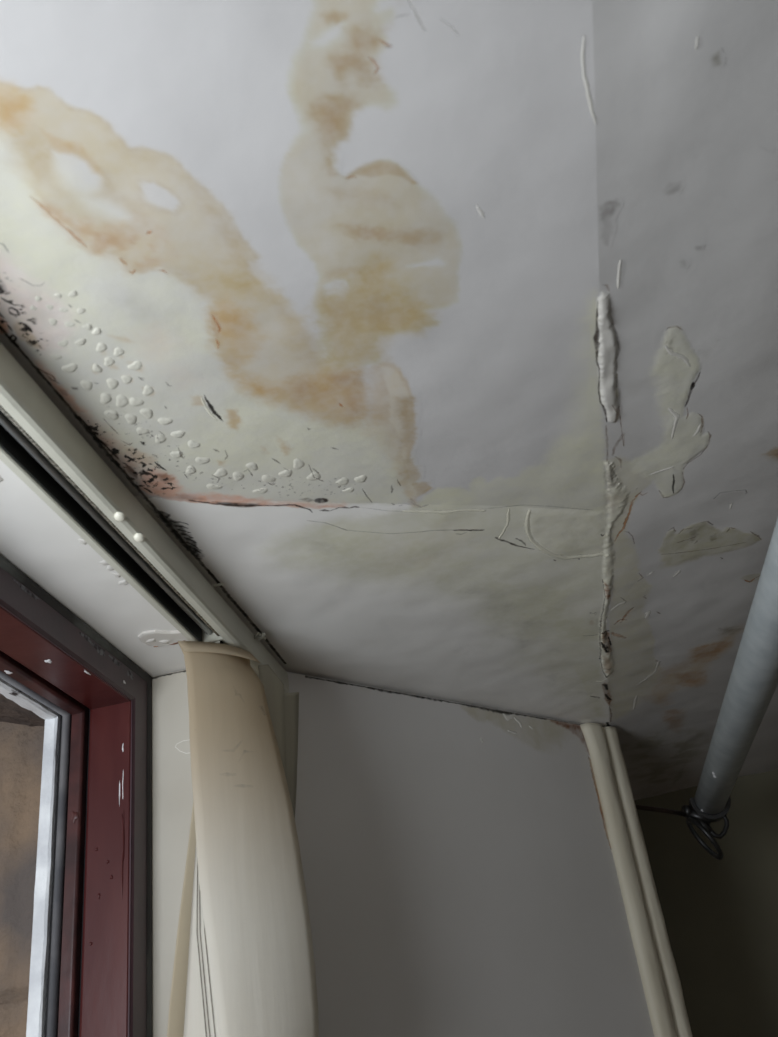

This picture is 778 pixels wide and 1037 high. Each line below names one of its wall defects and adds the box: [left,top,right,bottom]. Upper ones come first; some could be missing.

crack [0,325,581,725]
damp [0,0,717,800]
peeling [653,520,763,572]